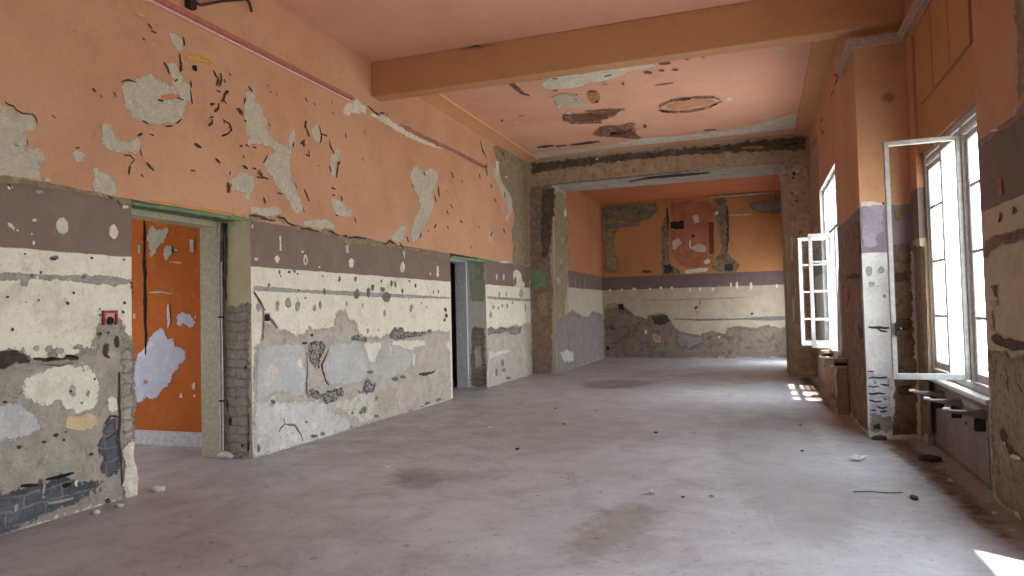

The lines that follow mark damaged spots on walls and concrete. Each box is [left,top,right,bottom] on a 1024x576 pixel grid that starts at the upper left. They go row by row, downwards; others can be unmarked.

peeling [0,101,50,196]
spalling [0,282,196,536]
peeling [92,32,197,177]
peeling [143,70,357,253]
crack [279,418,303,441]
spalling [276,297,322,311]
crack [306,350,329,398]
spalling [225,302,451,459]
peeling [391,165,453,259]
peeling [540,64,655,114]
spalling [470,118,824,387]
spalling [837,221,931,437]